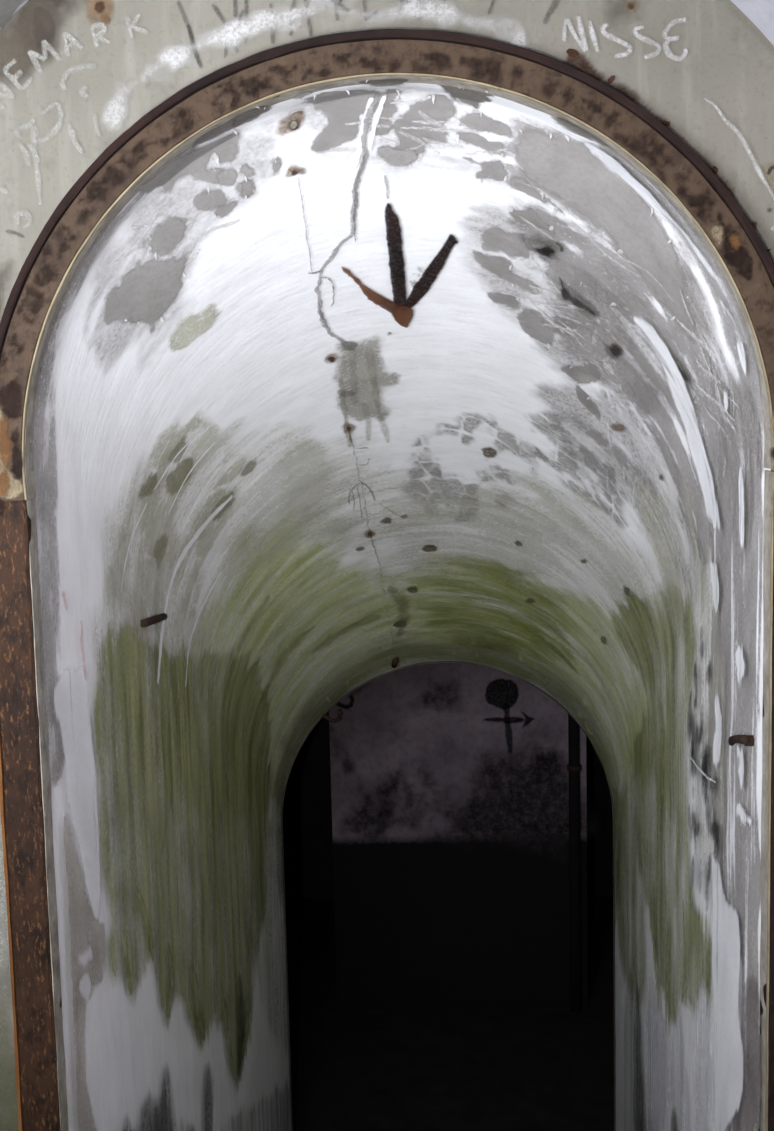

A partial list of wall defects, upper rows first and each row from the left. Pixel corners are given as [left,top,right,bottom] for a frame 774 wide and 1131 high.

rust [566,49,637,101]
peeling [272,155,281,172]
crack [298,94,389,343]
rust [703,159,737,202]
peeling [0,106,271,783]
leakage [336,340,397,447]
leakage [689,629,718,900]
leakage [625,987,647,1131]